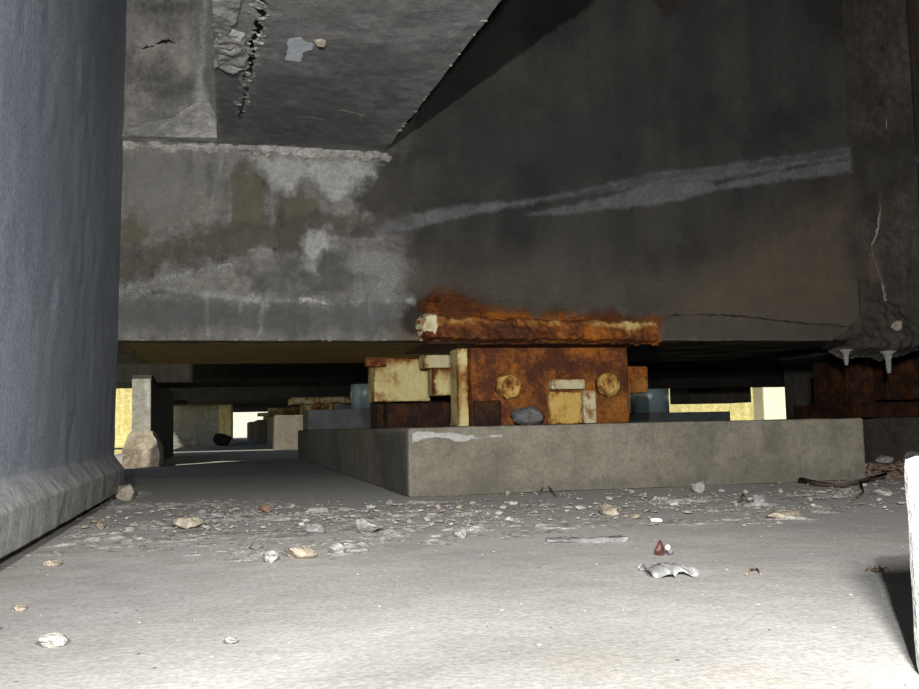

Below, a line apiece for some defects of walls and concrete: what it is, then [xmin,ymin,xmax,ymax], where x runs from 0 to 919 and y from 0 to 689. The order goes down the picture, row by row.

crack [136,39,176,49]
spalling [210,0,249,74]
water stain [119,147,852,364]
crack [865,191,886,301]
rust [419,291,663,327]
water stain [666,297,919,373]